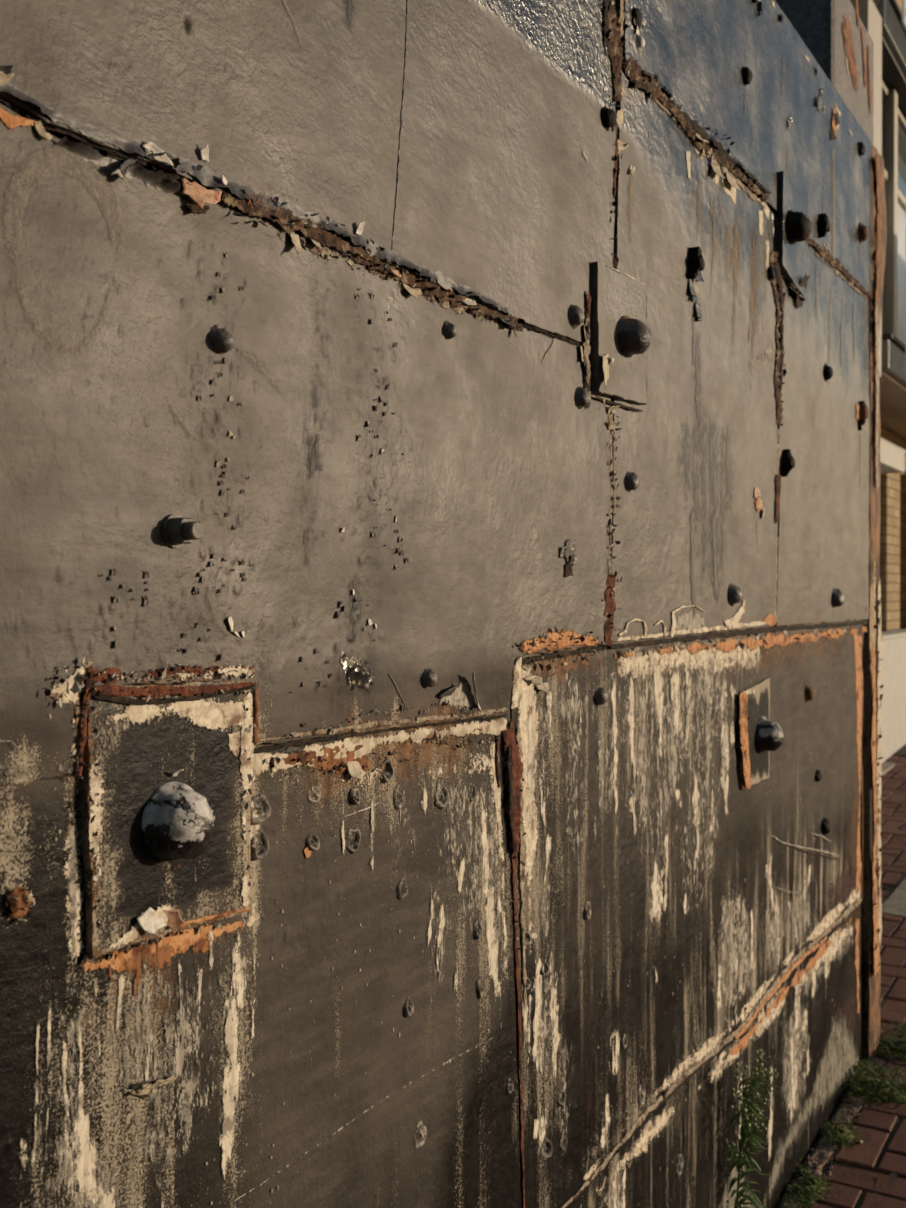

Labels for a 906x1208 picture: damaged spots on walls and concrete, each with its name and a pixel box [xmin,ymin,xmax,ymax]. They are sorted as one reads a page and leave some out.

peeling [0,64,15,86]
peeling [118,140,525,337]
corrosion [856,155,883,488]
peeling [336,589,377,642]
leakage [68,813,83,973]
leakage [20,930,256,1208]
corrosion [108,932,238,999]
corrosion [76,557,885,977]
leakage [598,1158,626,1208]
leakage [370,650,856,1158]
peeling [575,632,864,1208]
leakage [720,927,858,1208]